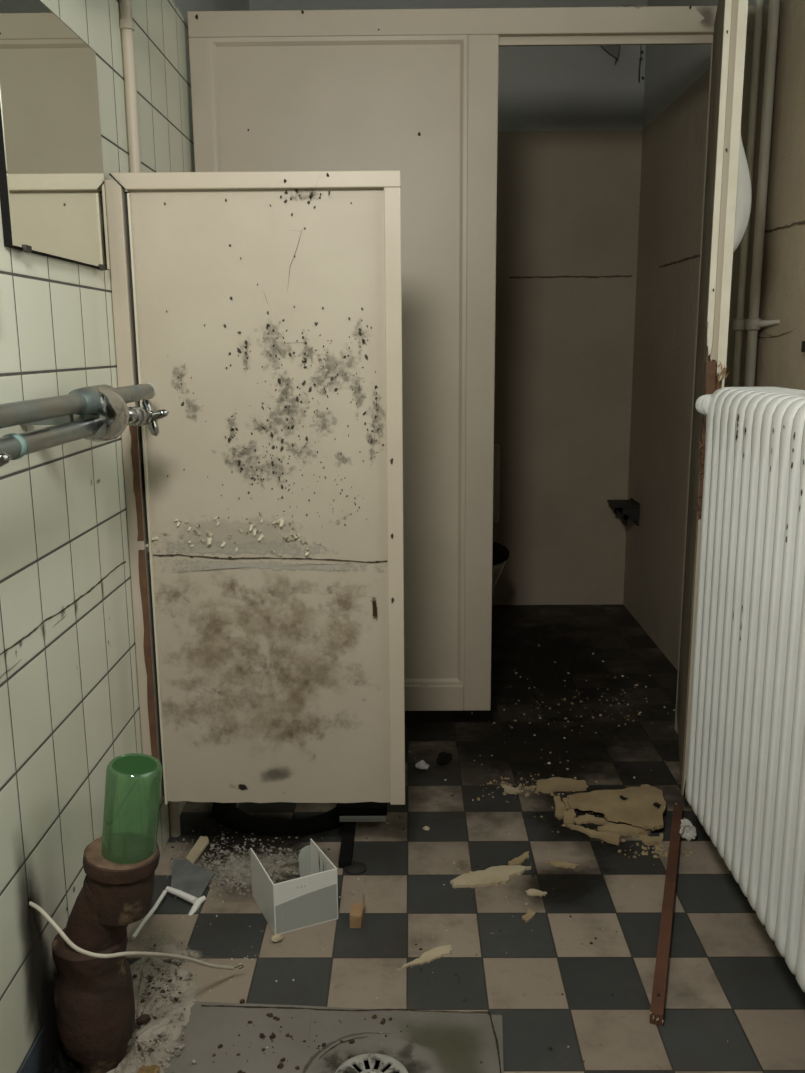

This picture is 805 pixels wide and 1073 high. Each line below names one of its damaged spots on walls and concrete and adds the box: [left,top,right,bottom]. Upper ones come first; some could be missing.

crack [765,221,805,233]
leakage [225,307,372,527]
peeling [174,517,321,556]
crack [153,554,387,563]